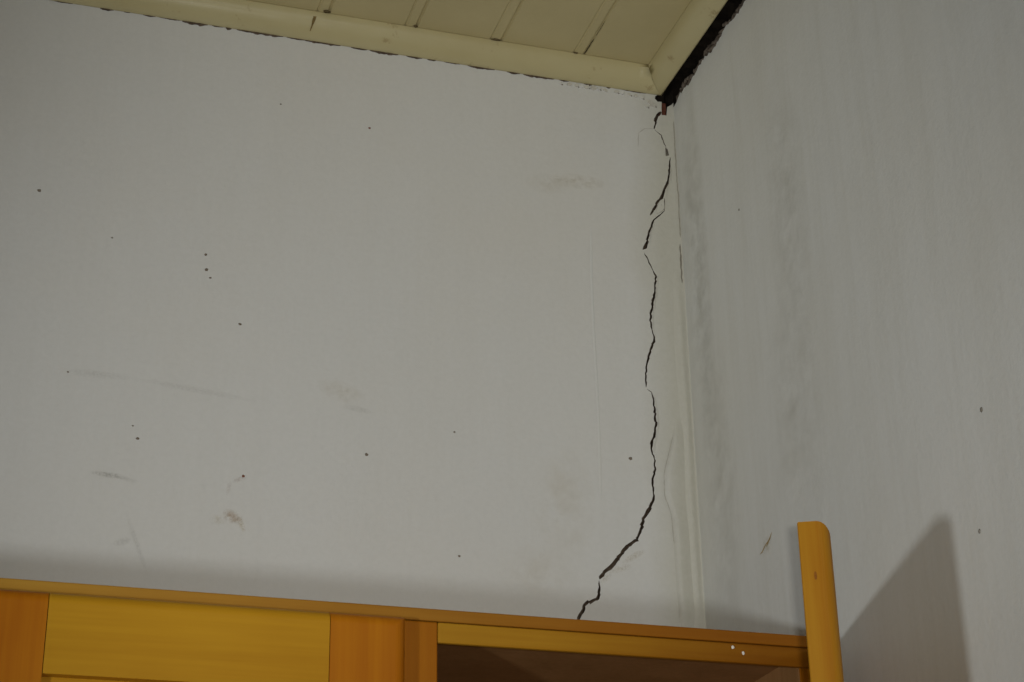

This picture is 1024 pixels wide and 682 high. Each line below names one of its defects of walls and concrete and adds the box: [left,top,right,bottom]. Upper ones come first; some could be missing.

crack [100,8,683,620]